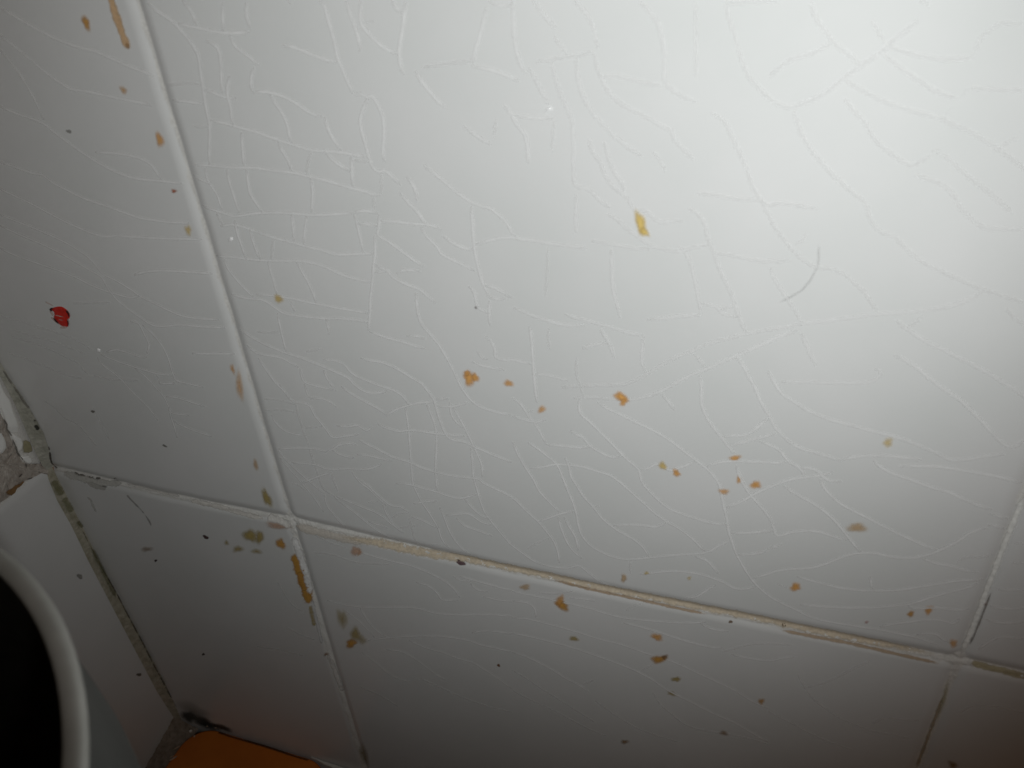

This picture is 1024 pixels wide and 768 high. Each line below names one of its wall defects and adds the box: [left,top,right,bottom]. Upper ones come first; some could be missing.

corrosion [109,0,129,48]
corrosion [465,371,478,385]
spalling [0,384,49,502]
crack [4,420,115,487]
corrosion [236,523,312,603]